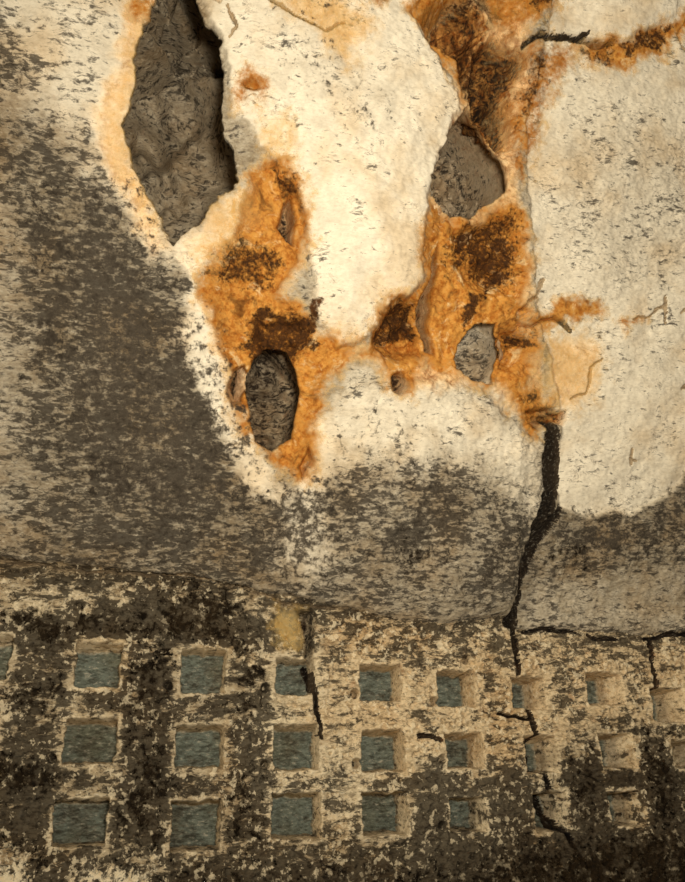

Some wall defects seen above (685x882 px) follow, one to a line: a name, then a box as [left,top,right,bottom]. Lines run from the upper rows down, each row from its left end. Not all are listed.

rust [403,0,564,112]
rust [486,12,685,180]
water stain [6,167,479,602]
rust [189,153,605,492]
water stain [432,496,534,607]
crack [502,415,618,676]
crack [300,667,324,740]
crack [643,630,685,691]
crack [496,705,574,842]